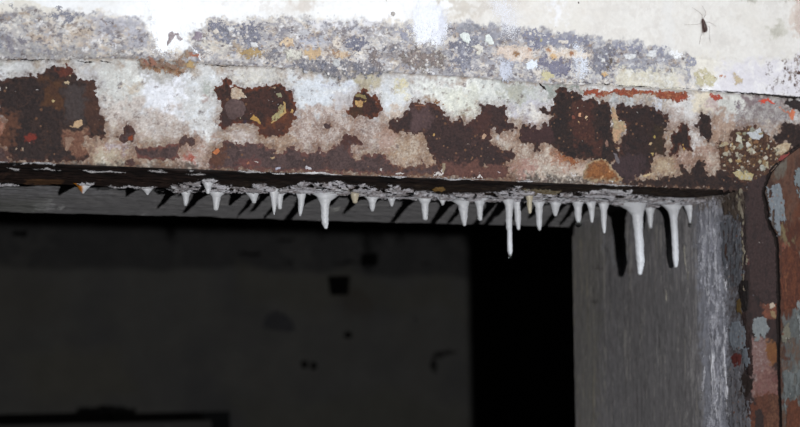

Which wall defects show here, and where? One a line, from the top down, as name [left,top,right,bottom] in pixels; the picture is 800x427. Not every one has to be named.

spalling [44,5,85,25]
spalling [167,20,494,81]
spalling [521,28,697,81]
rust [0,63,106,164]
damp [0,162,61,171]
rust [117,125,195,167]
rust [208,77,800,260]
peeling [766,183,786,236]
damp [168,170,730,427]
rust [780,246,800,310]
rust [731,279,753,397]
peeling [724,299,776,427]